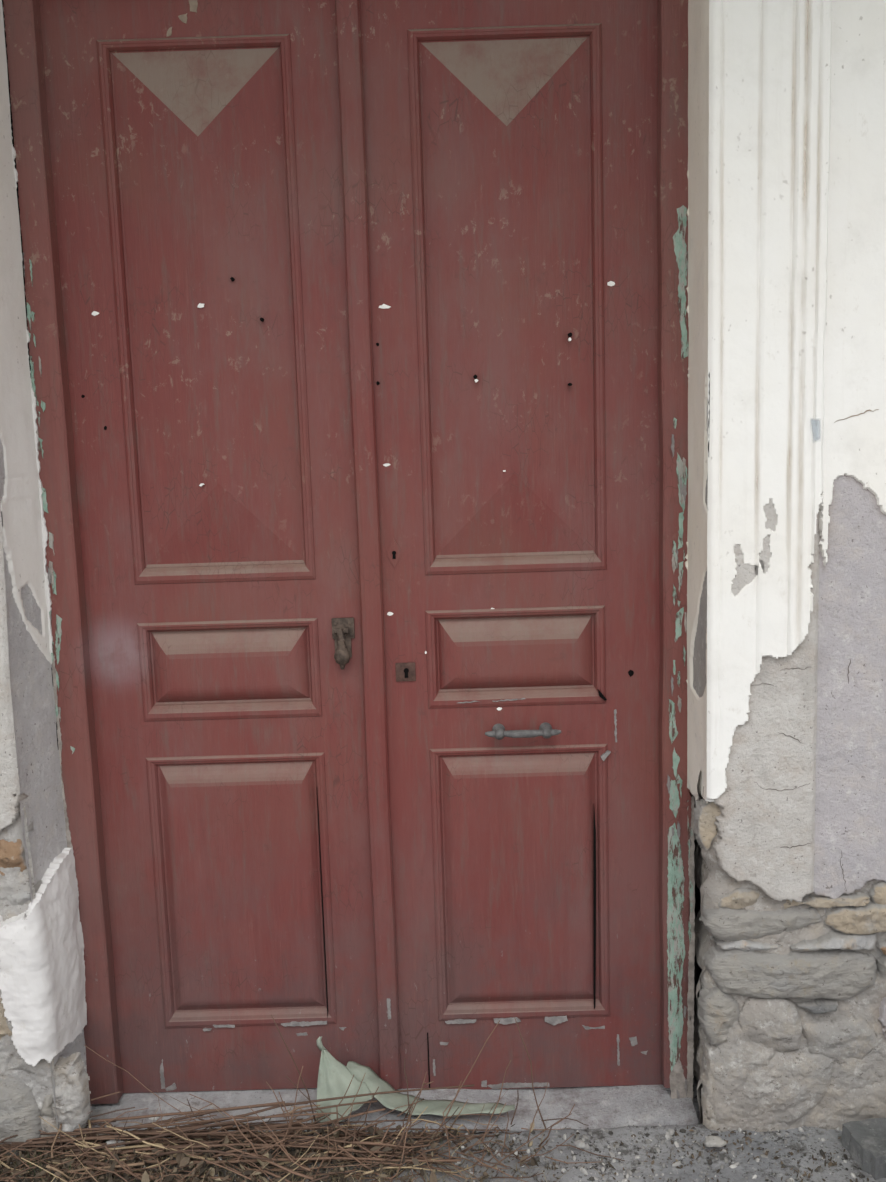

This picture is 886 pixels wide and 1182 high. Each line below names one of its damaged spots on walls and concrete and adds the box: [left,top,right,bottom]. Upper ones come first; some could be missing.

peeling [27,302,46,457]
peeling [0,439,75,922]
flaking render [667,418,886,1148]
flaking render [0,989,108,1155]